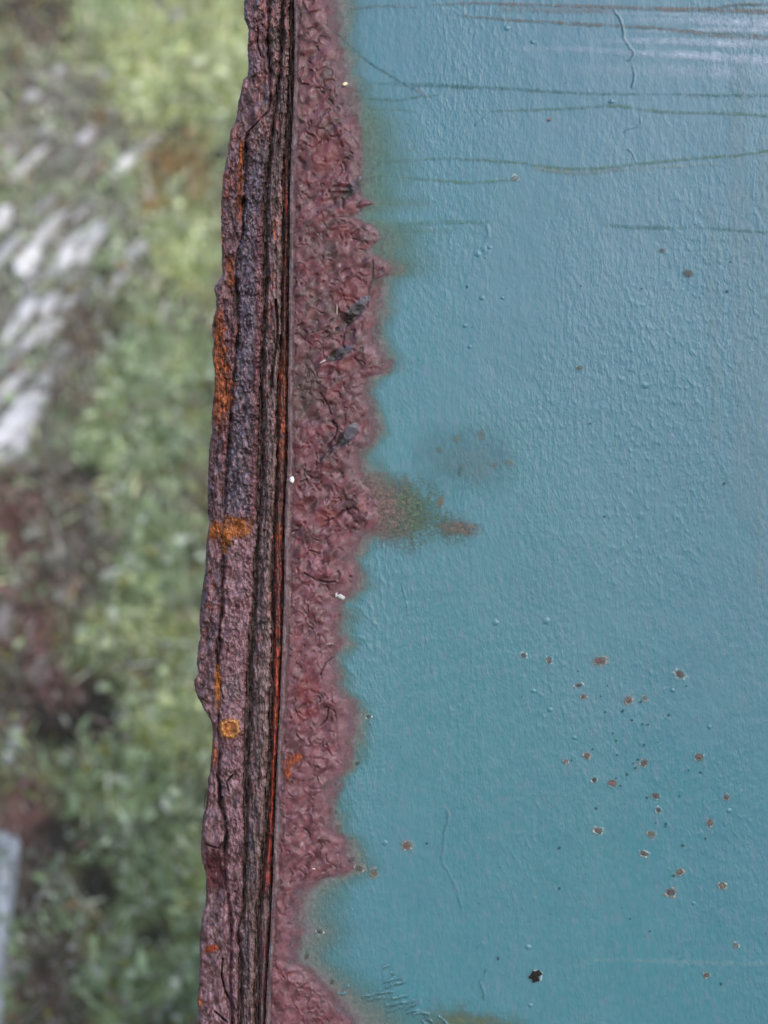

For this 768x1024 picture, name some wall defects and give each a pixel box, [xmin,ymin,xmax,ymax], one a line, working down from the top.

corrosion [194,0,474,1024]